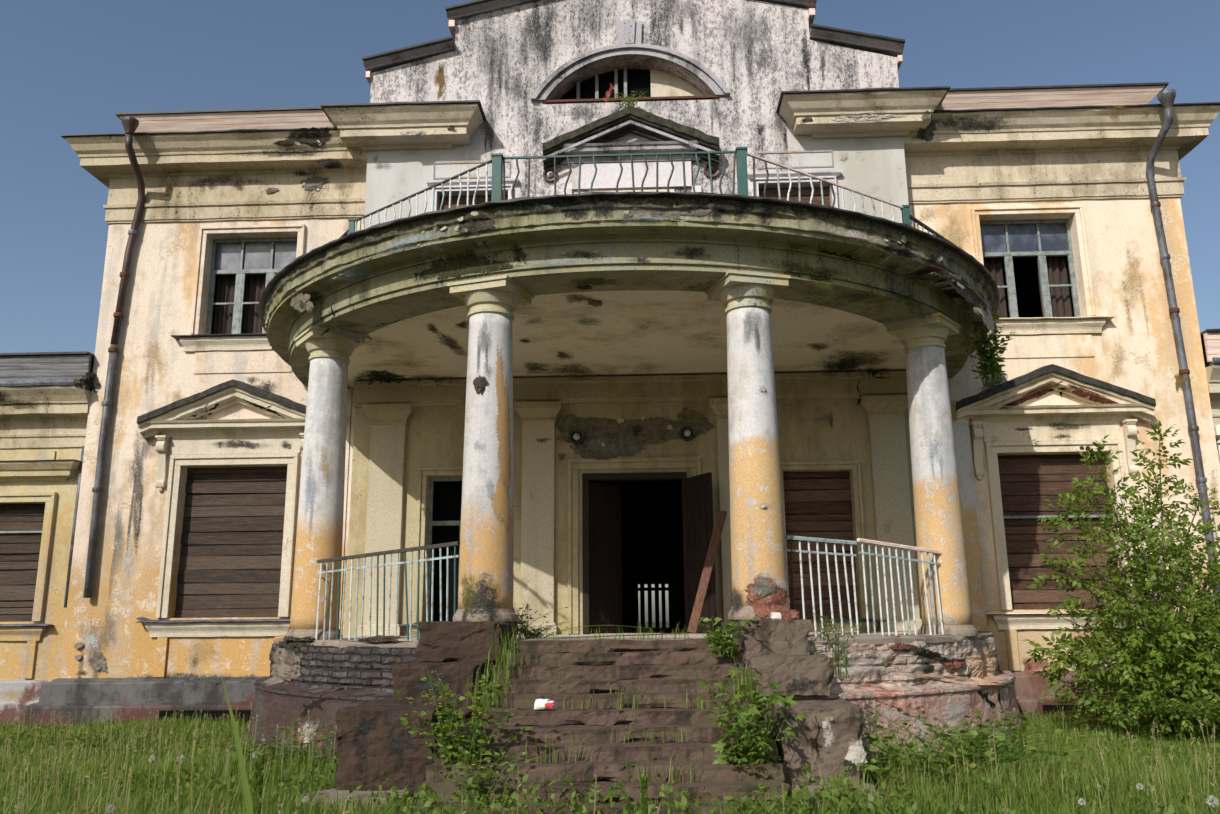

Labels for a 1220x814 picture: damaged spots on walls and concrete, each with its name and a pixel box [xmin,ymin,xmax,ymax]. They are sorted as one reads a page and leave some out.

water stain [801,33,810,90]
water stain [508,195,628,219]
water stain [668,196,784,228]
water stain [415,245,526,281]
water stain [428,322,487,368]
water stain [0,392,44,409]
peeling [473,349,511,528]
peeling [554,407,714,460]
water stain [111,439,149,576]
spalling [729,571,790,620]
water stain [74,616,113,679]
spalling [836,642,970,739]